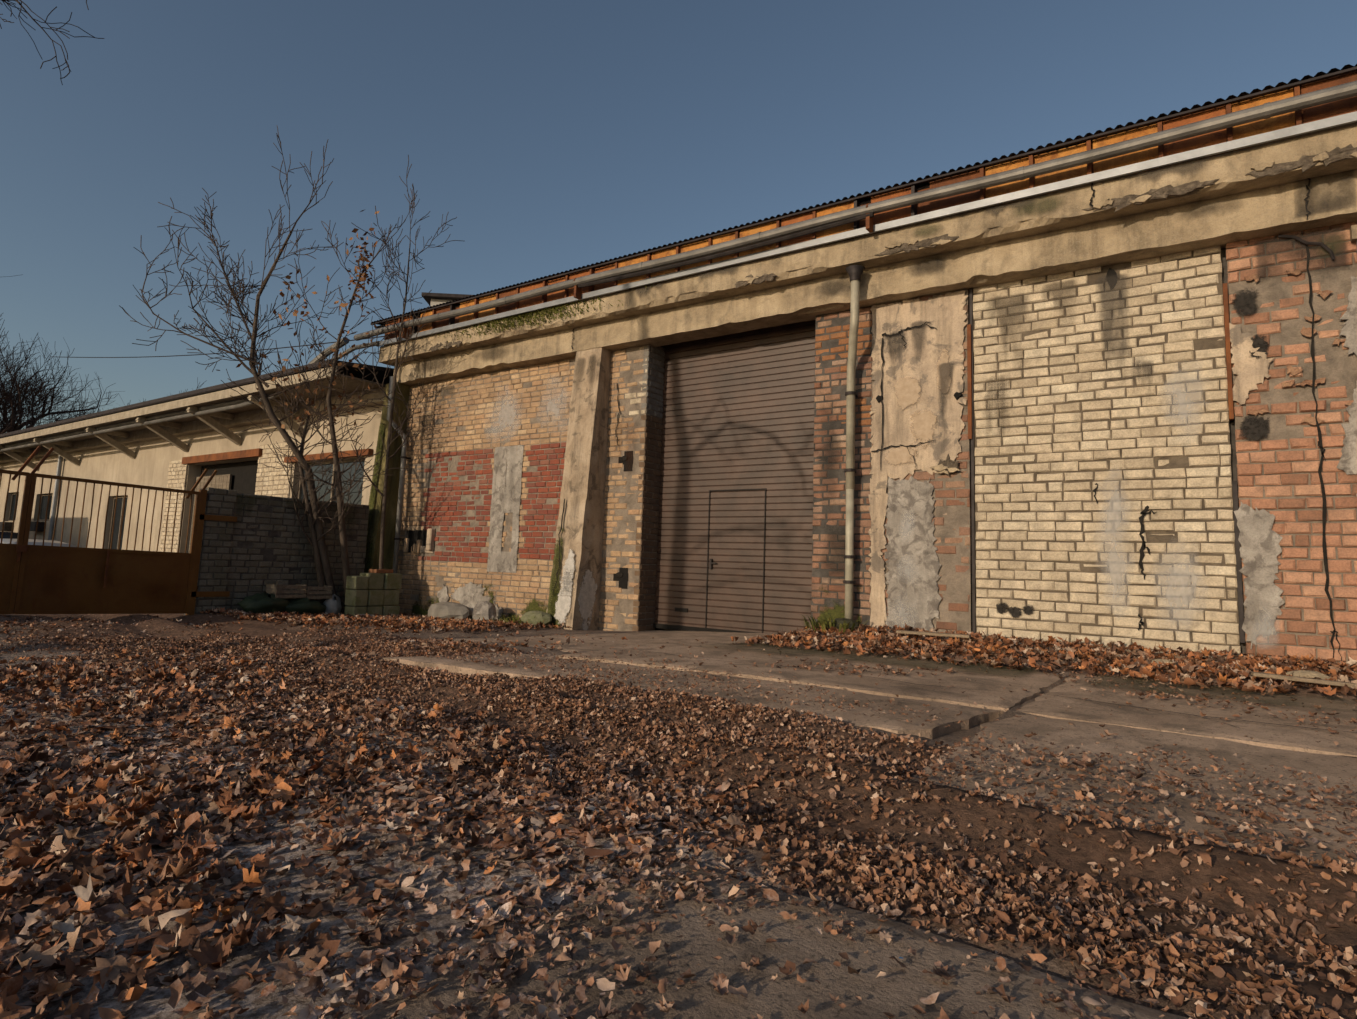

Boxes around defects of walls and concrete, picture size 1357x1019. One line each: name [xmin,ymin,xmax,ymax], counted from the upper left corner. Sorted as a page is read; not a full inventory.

peeling [868,290,968,632]
peeling [1229,273,1326,441]
crack [1304,178,1342,661]
peeling [1317,275,1357,356]
peeling [1336,381,1357,475]
crack [1139,506,1156,580]
peeling [1234,502,1285,649]